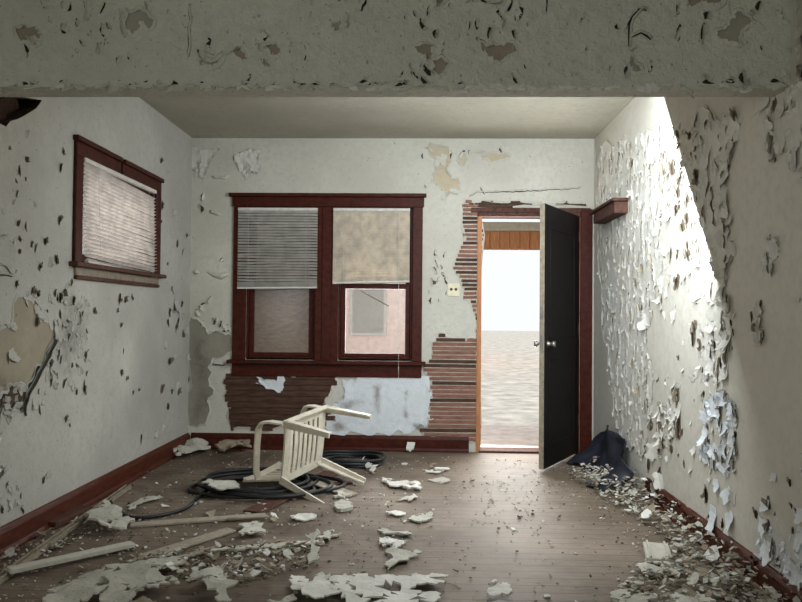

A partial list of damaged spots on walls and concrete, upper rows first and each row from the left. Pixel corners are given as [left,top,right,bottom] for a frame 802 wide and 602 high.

spalling [0,0,622,120]
peeling [634,0,802,184]
peeling [12,156,30,205]
peeling [761,234,779,277]
peeling [0,219,98,443]
peeling [160,106,740,543]
peeling [750,300,765,346]
peeling [0,462,26,514]
peeling [752,496,802,591]